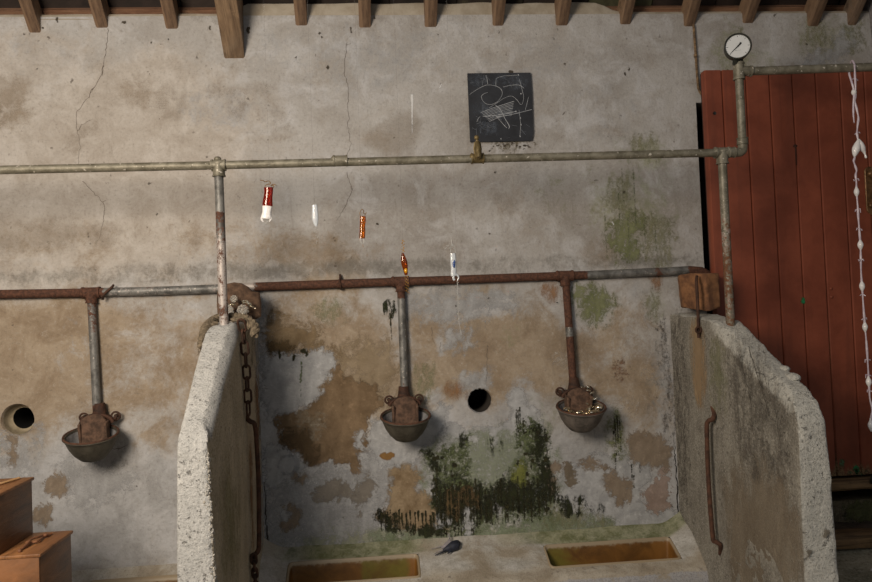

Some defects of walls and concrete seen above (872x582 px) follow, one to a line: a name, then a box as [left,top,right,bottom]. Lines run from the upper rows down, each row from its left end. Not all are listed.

leakage [604,172,678,266]
flaking render [272,364,384,518]
leakage [263,366,546,548]